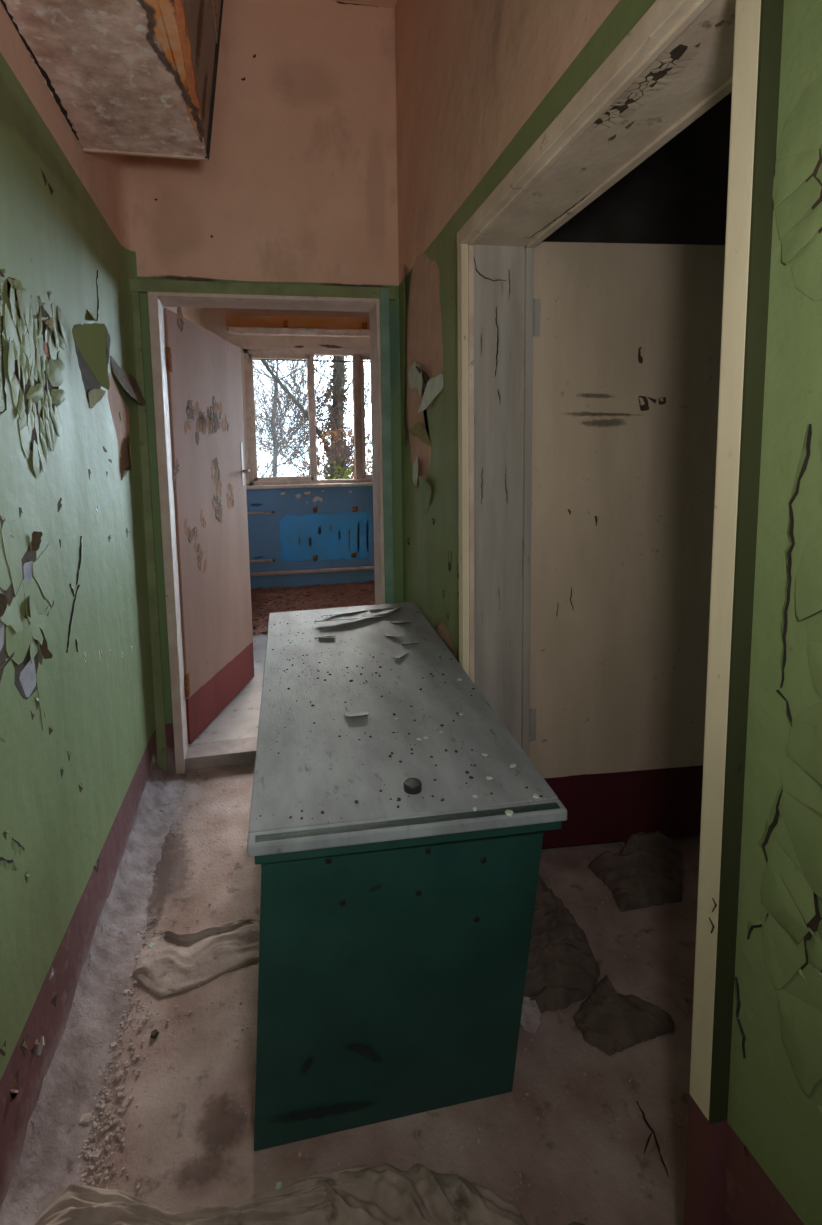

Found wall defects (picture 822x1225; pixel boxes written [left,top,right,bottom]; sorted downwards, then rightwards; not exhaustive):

peeling [773,76,822,301]
crack [0,316,8,416]
peeling [0,269,146,480]
peeling [403,254,444,525]
peeling [0,507,62,742]
peeling [779,703,822,899]